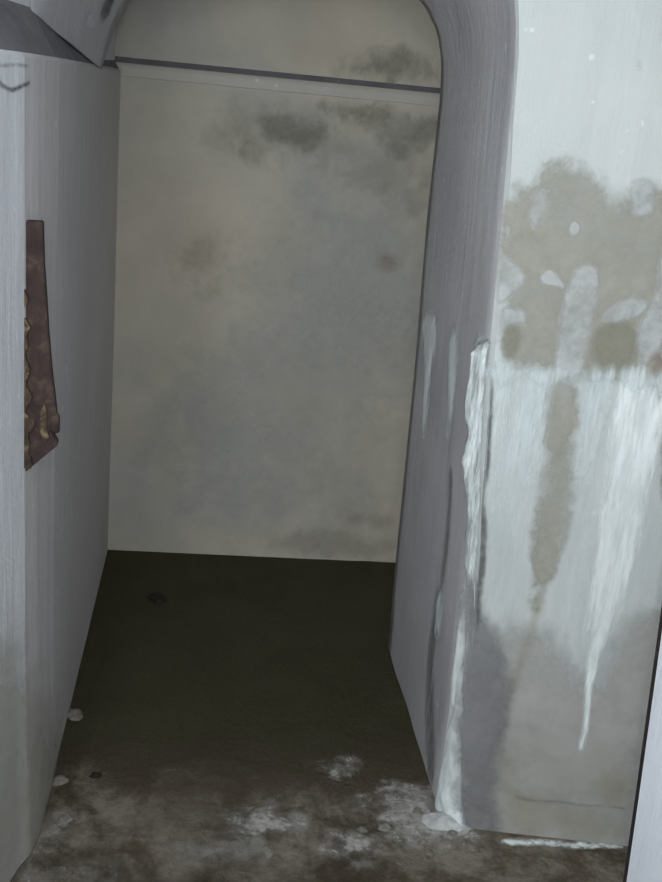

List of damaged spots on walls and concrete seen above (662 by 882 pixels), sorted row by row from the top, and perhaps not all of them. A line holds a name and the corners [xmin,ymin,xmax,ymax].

water stain [422,313,436,431]
peeling [497,163,662,385]
water stain [380,330,662,848]
water stain [331,832,370,852]